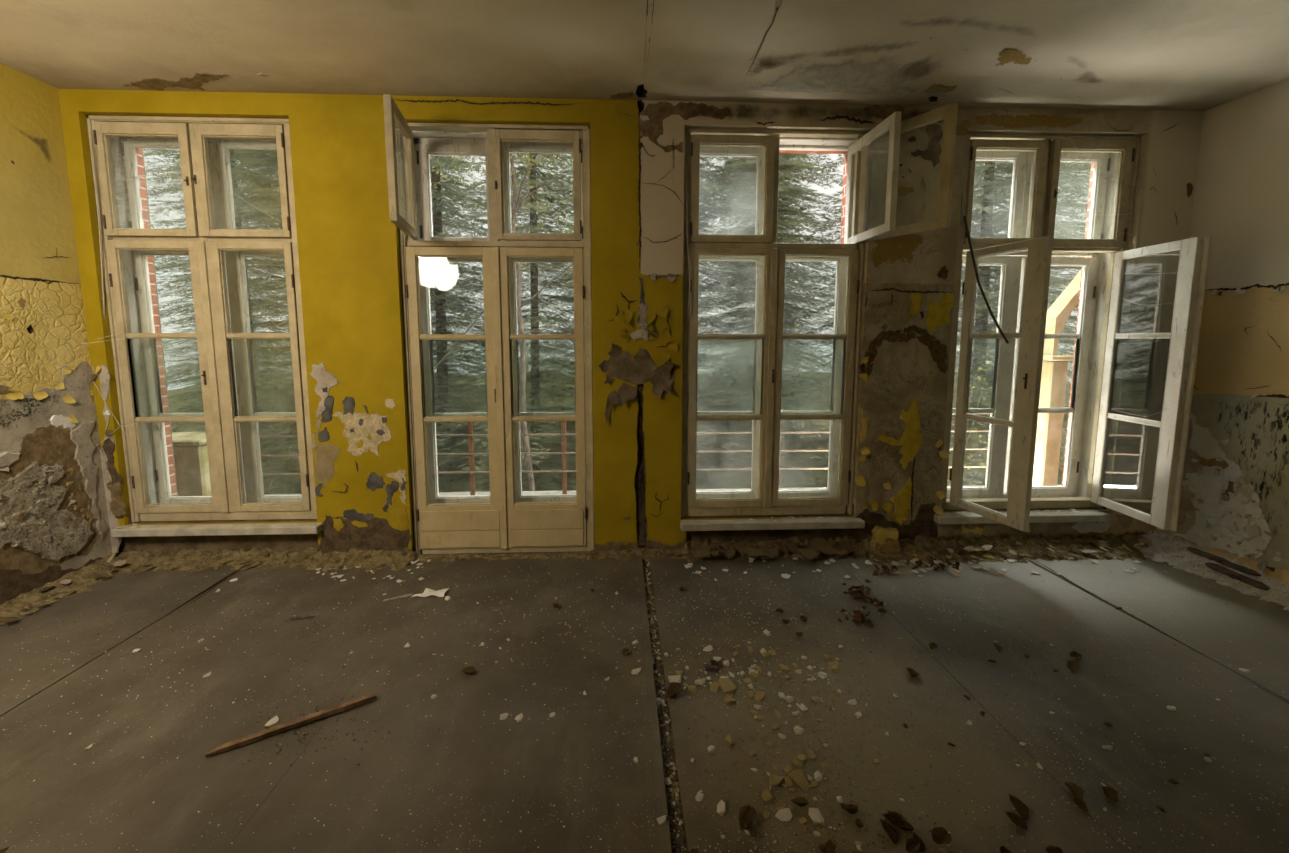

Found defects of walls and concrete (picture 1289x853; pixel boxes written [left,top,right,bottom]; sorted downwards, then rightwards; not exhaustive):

crack [743,0,782,83]
crack [820,115,875,124]
peeling [863,105,912,121]
peeling [899,120,971,178]
peeling [909,293,954,331]
peeling [598,303,678,424]
peeling [309,362,396,456]
spalling [0,361,150,622]
peeling [318,469,412,553]
peeling [1169,393,1289,572]